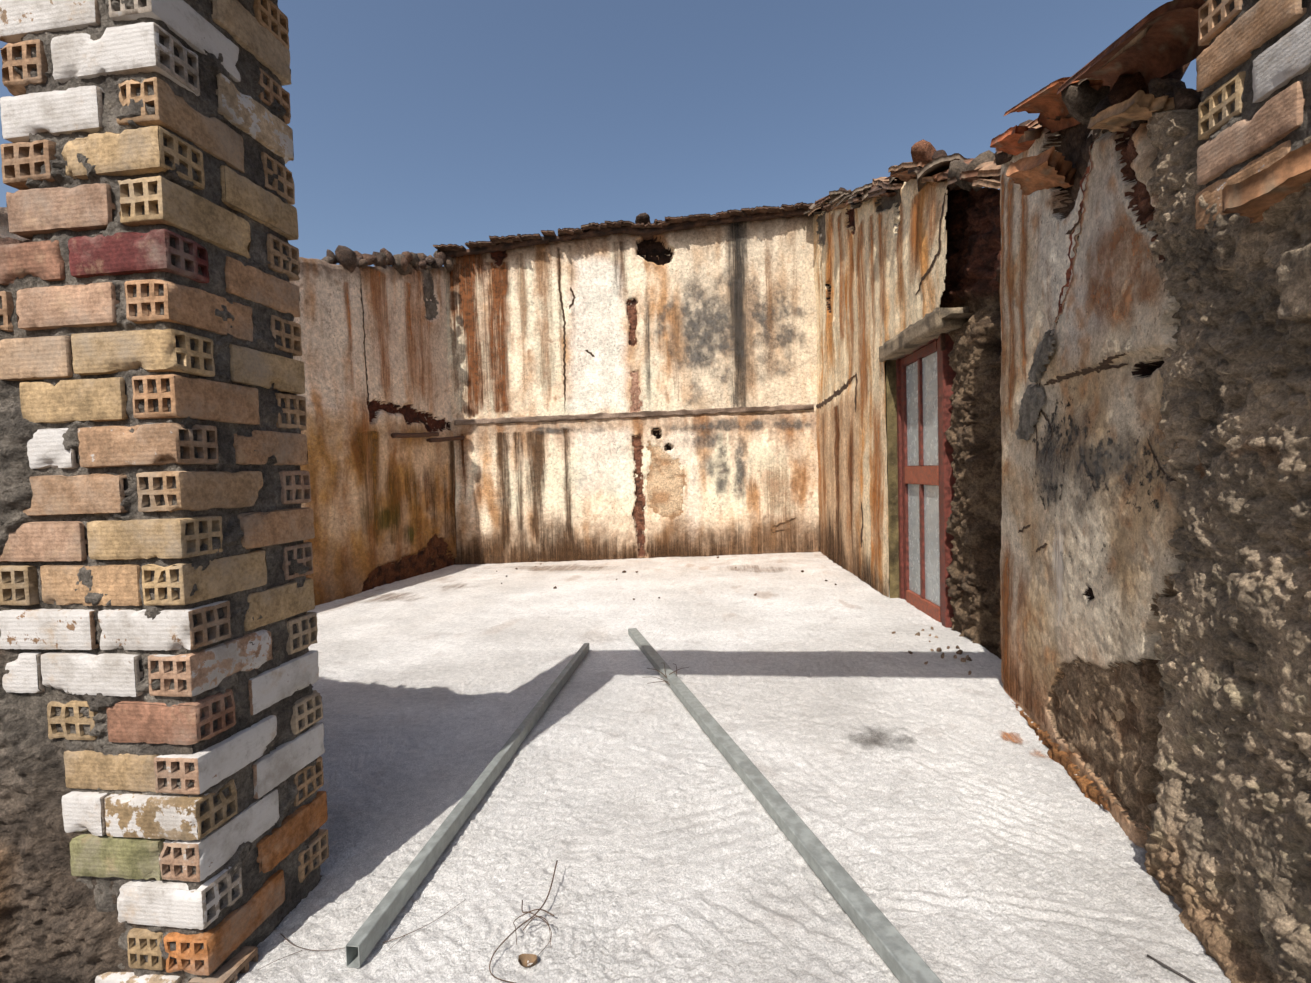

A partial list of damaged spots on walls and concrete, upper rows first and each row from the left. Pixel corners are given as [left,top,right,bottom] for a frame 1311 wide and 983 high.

corrosion [448,252,545,417]
spalling [637,236,674,265]
corrosion [830,182,936,569]
crack [916,193,946,295]
spalling [803,114,1099,659]
corrosion [999,174,1027,419]
crack [1054,129,1103,325]
crack [1035,353,1129,465]
corrosion [1087,215,1158,322]
spalling [1115,126,1165,262]
spalling [1131,357,1165,378]
peeling [1046,656,1164,831]